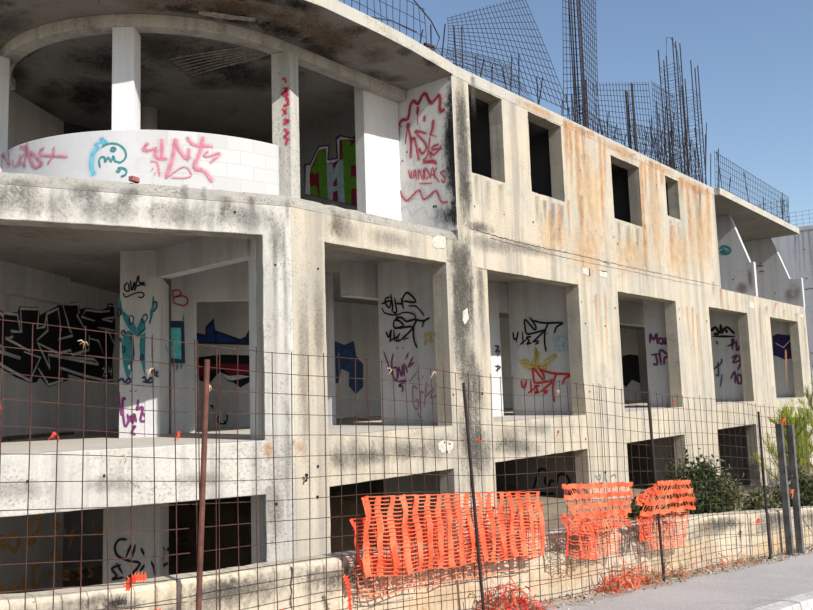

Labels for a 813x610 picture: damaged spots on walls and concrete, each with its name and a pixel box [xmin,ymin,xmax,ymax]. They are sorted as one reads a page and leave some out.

leakage [66,48,112,72]
leakage [68,81,112,112]
rust [564,121,591,155]
leakage [441,93,469,223]
leakage [191,576,271,609]